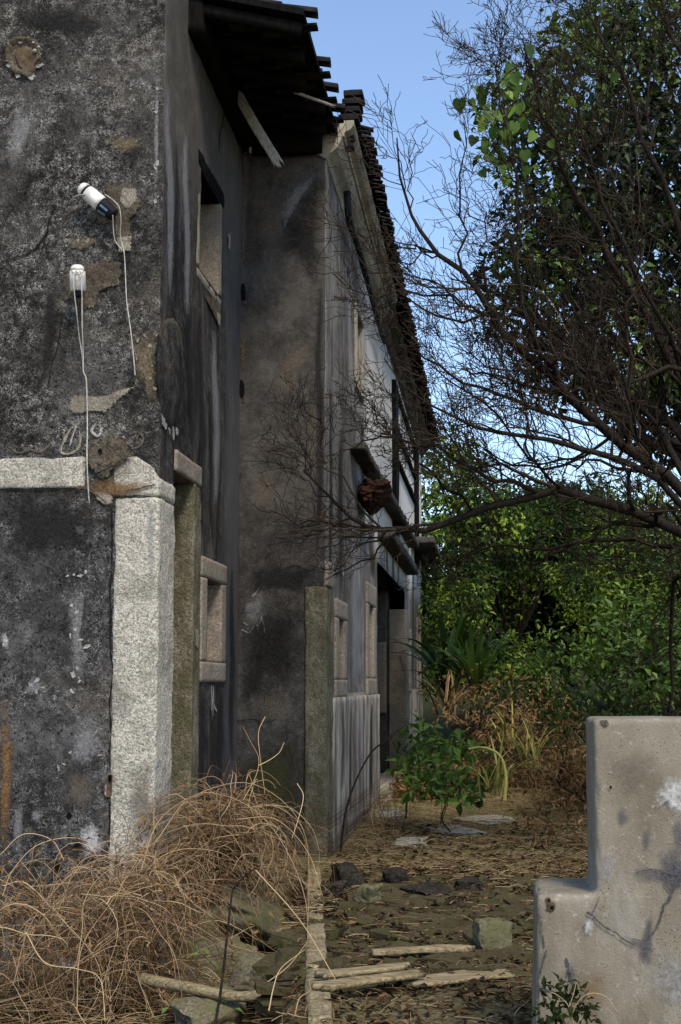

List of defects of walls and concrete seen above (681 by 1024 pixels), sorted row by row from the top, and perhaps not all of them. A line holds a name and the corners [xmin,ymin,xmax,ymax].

spalling [5,36,43,81]
peeling [60,182,157,312]
peeling [65,387,133,414]
rust [1,726,13,836]
crack [582,869,681,945]